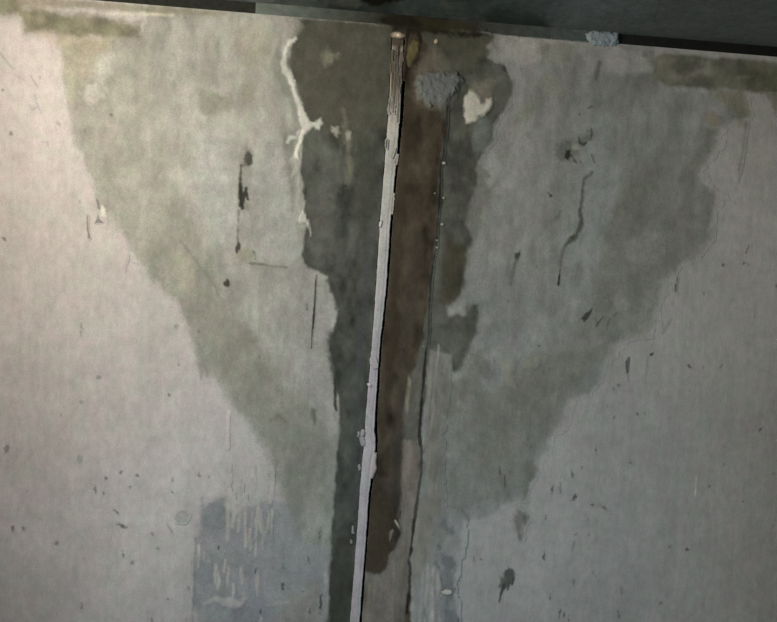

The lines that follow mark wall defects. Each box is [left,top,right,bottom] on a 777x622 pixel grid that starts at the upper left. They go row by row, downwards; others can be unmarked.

water stain [0,0,336,543]
corrosion [365,32,463,579]
crack [404,102,450,615]
spalling [462,86,494,125]
water stain [231,0,777,622]